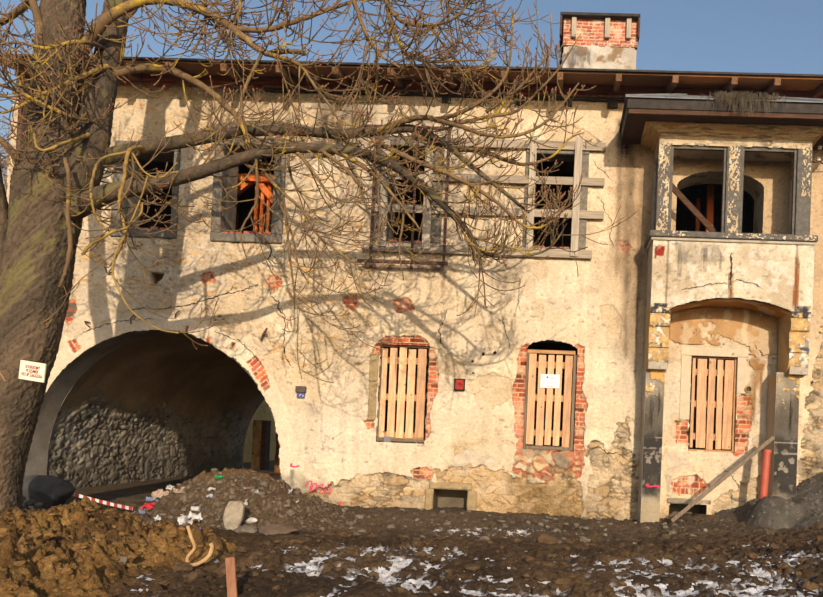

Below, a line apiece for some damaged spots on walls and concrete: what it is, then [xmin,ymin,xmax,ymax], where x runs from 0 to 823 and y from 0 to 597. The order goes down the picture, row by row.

peeling [656,135,816,241]
crack [83,284,293,368]
flaking render [247,356,271,392]
flaking render [304,295,373,381]
flaking render [393,298,415,314]
flaking render [305,336,639,521]
flaking render [645,306,778,397]
crack [682,252,763,291]
flaking render [733,395,754,458]
flaking render [777,311,823,483]
flaking render [670,474,710,497]
flaking render [711,476,760,515]